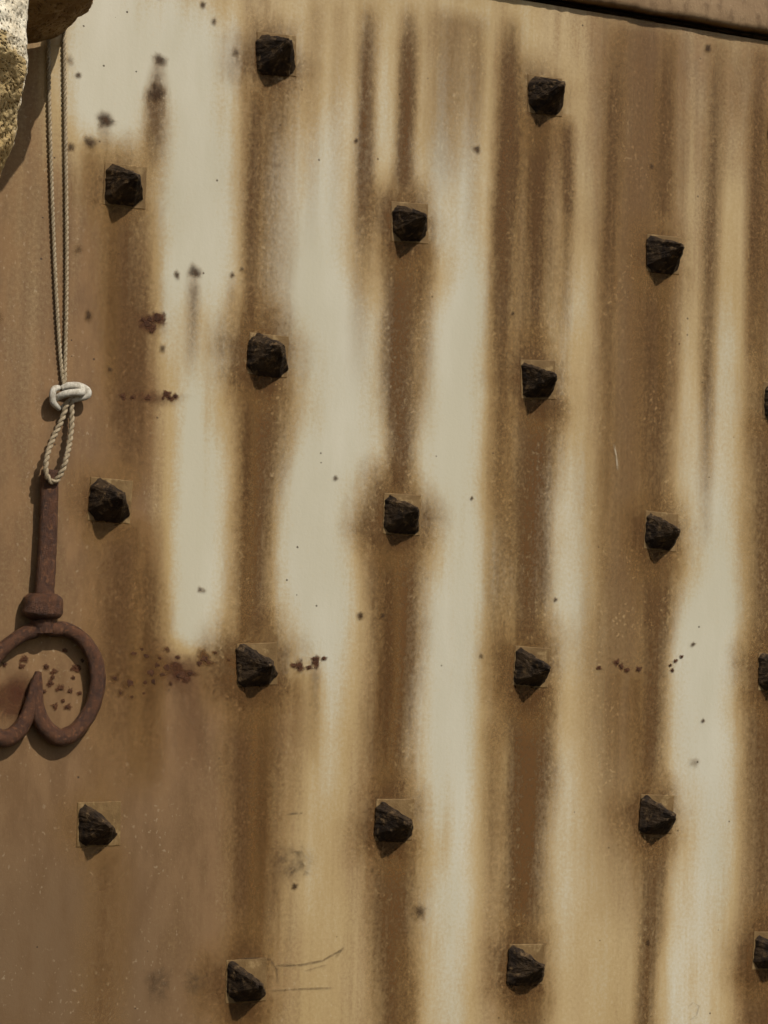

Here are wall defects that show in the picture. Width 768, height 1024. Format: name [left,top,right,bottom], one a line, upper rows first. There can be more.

rust [0,655,30,715]
rust [43,659,84,710]
rust [99,114,114,126]
rust [108,29,327,1024]
rust [355,19,432,1024]
rust [494,30,574,1024]
rust [596,32,683,1024]
rust [703,84,719,424]